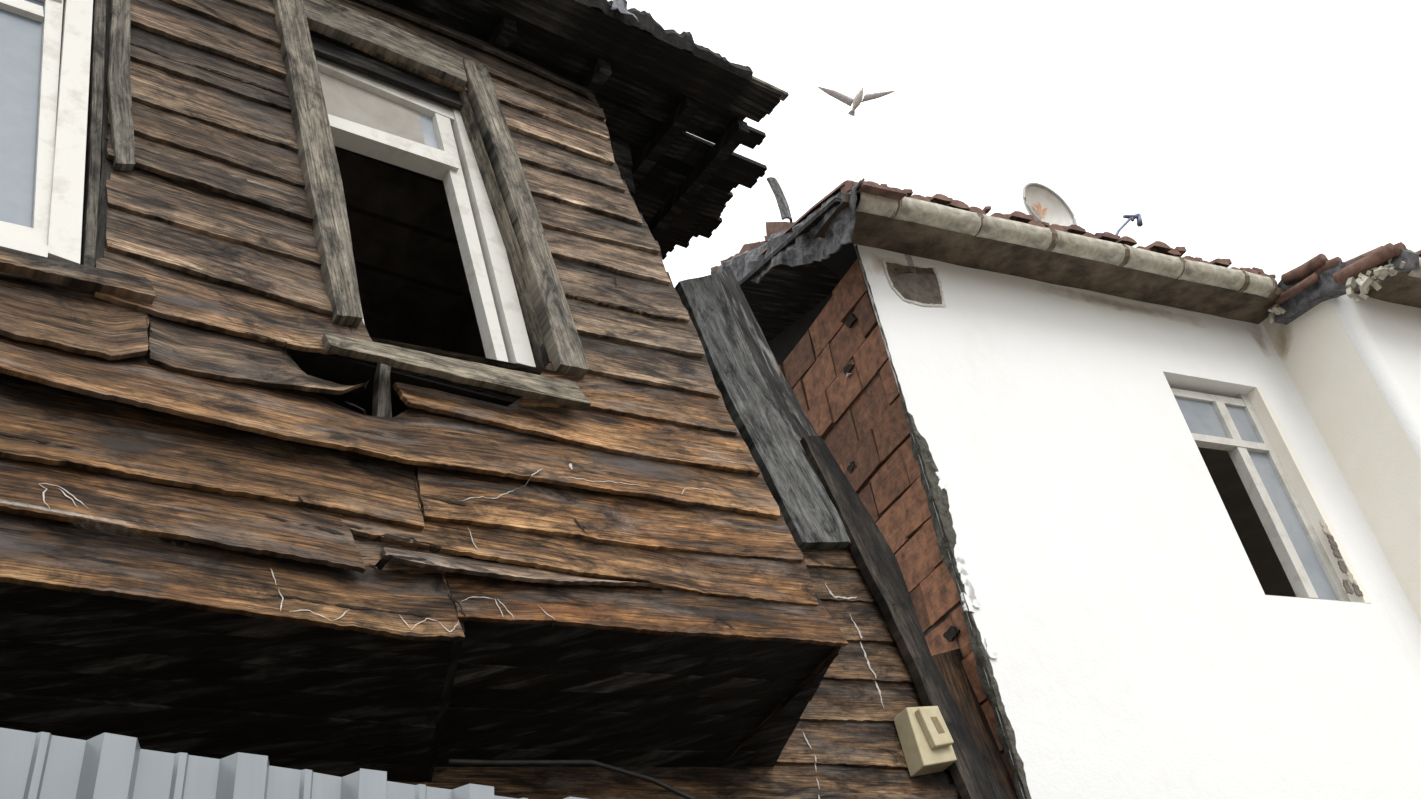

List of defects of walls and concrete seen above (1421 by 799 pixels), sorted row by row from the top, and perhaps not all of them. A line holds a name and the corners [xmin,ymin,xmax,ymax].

crack [257,465,466,623]
spalling [855,244,1032,799]